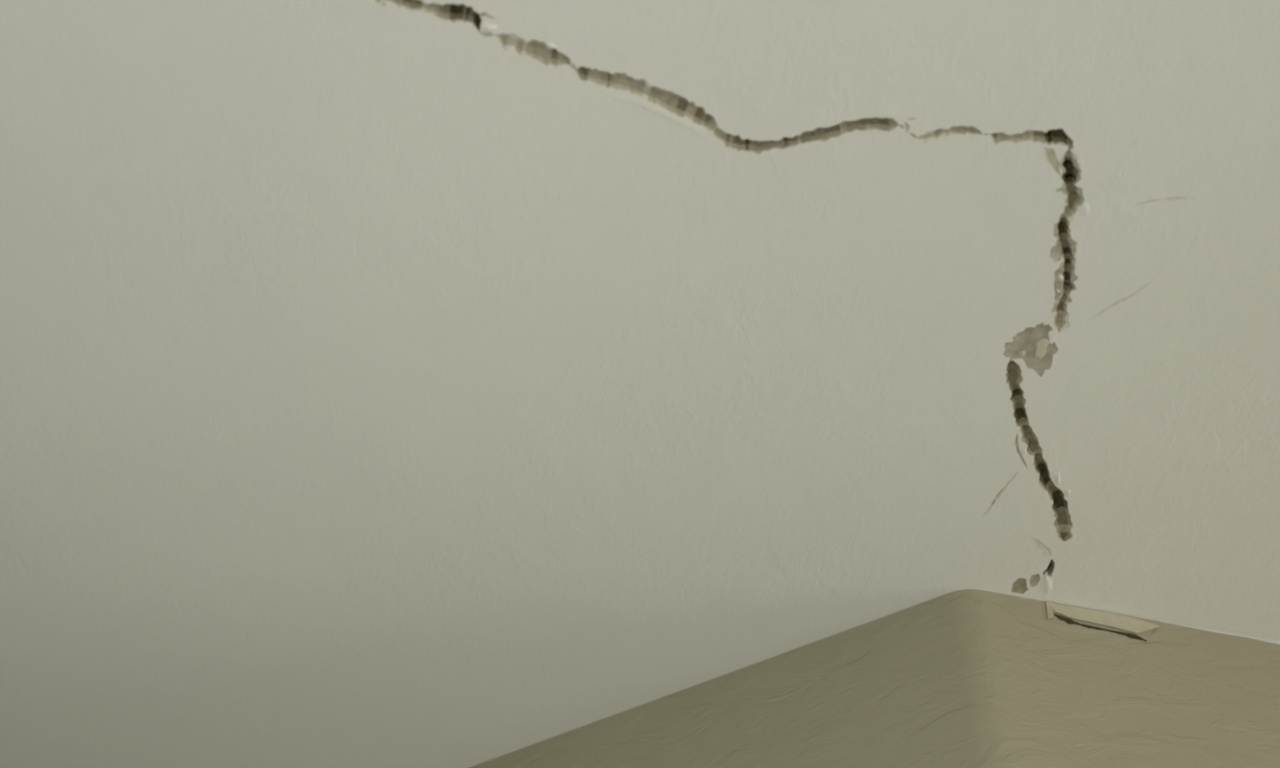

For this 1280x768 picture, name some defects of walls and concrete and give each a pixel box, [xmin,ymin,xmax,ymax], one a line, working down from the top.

crack [373,0,1150,332]
crack [982,360,1073,577]